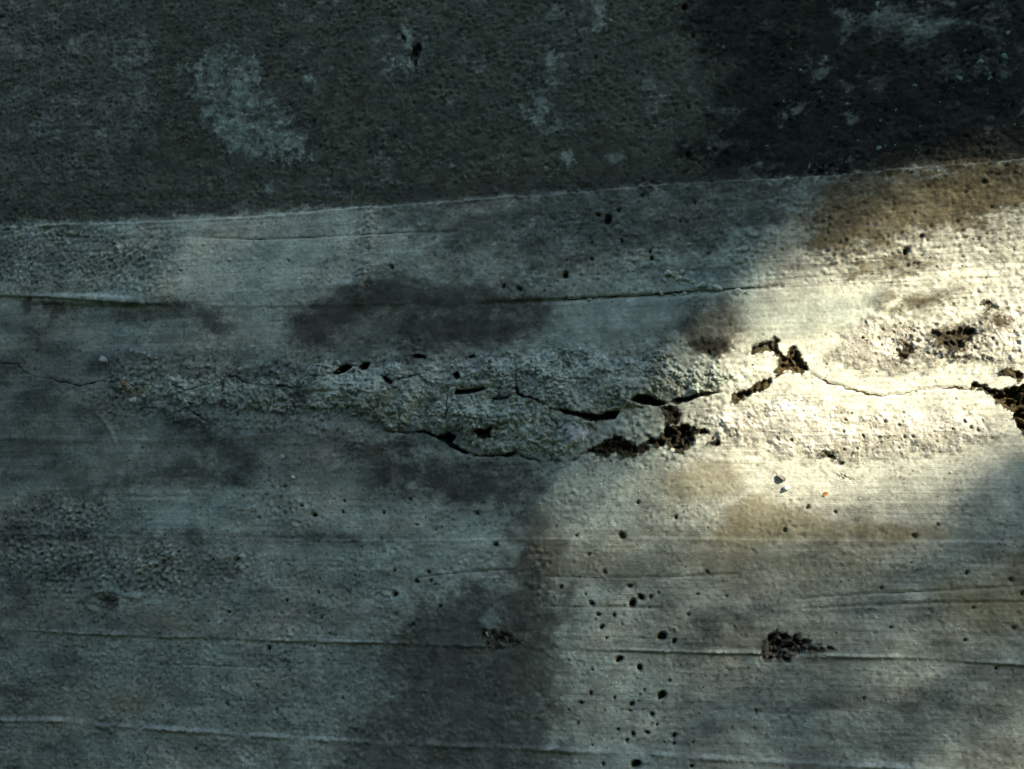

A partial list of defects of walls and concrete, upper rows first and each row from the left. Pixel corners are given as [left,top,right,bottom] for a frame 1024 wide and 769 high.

damp [919,158,1024,222]
damp [291,252,936,360]
crack [2,362,146,387]
crack [171,374,327,421]
crack [491,368,559,428]
spalling [559,409,620,421]
spalling [588,392,720,458]
spalling [732,336,808,403]
crack [774,370,967,397]
spalling [929,327,975,361]
spalling [971,367,1024,434]